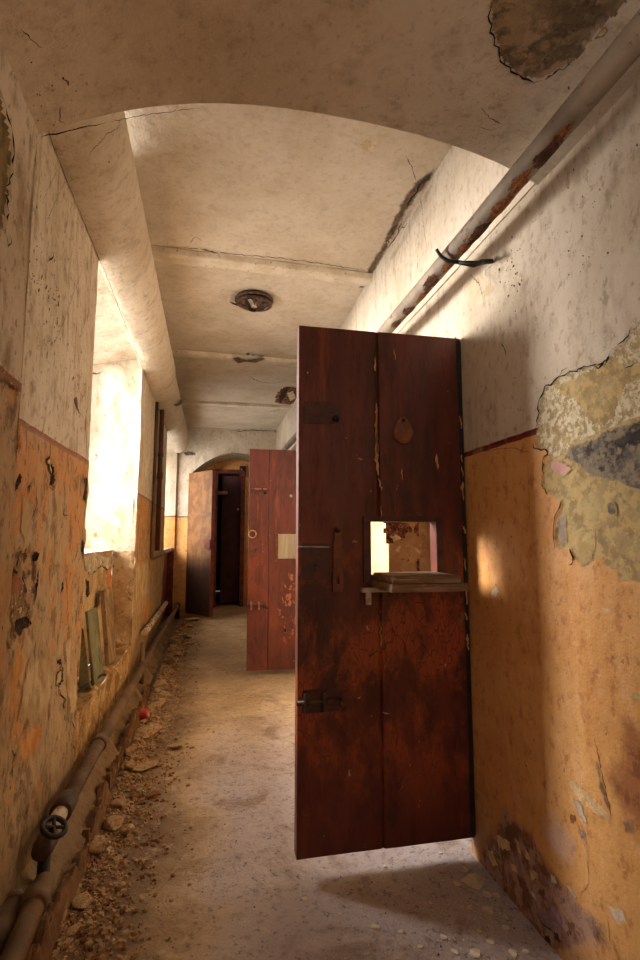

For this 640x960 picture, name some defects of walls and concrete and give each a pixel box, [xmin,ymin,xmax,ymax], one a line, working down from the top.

spalling [487,0,627,83]
crack [41,108,196,376]
corrosion [390,112,582,328]
spalling [533,321,640,583]
damp [477,798,619,960]